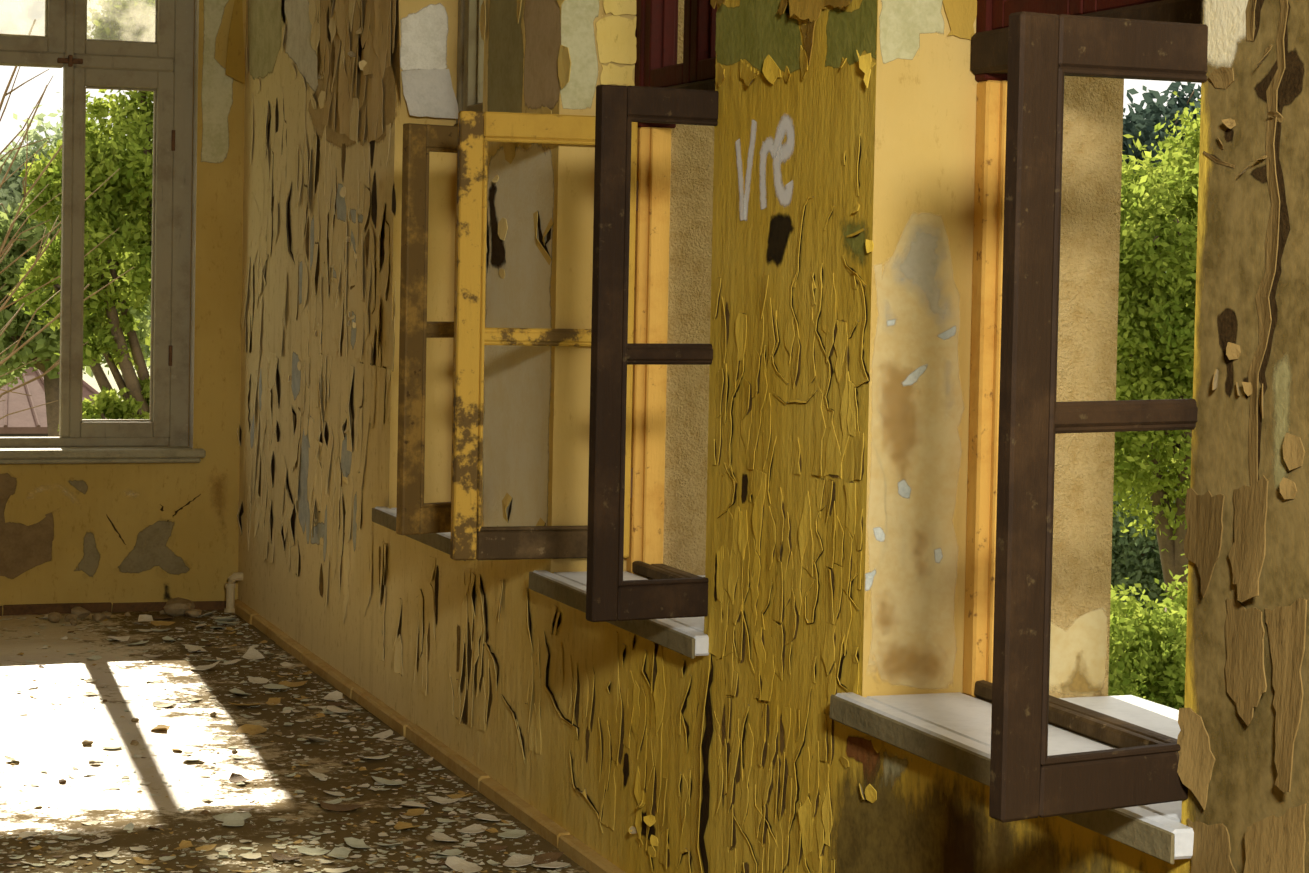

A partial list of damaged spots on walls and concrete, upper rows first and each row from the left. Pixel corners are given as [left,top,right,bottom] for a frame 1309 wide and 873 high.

peeling [479,0,636,114]
peeling [710,0,977,88]
peeling [1204,0,1248,89]
flaking render [1255,44,1304,123]
flaking render [1238,155,1268,183]
peeling [201,0,459,695]
peeling [902,364,928,386]
flaking render [0,466,193,586]
peeling [446,567,503,732]
crack [468,572,525,763]
crack [525,588,603,834]
crack [606,505,859,873]